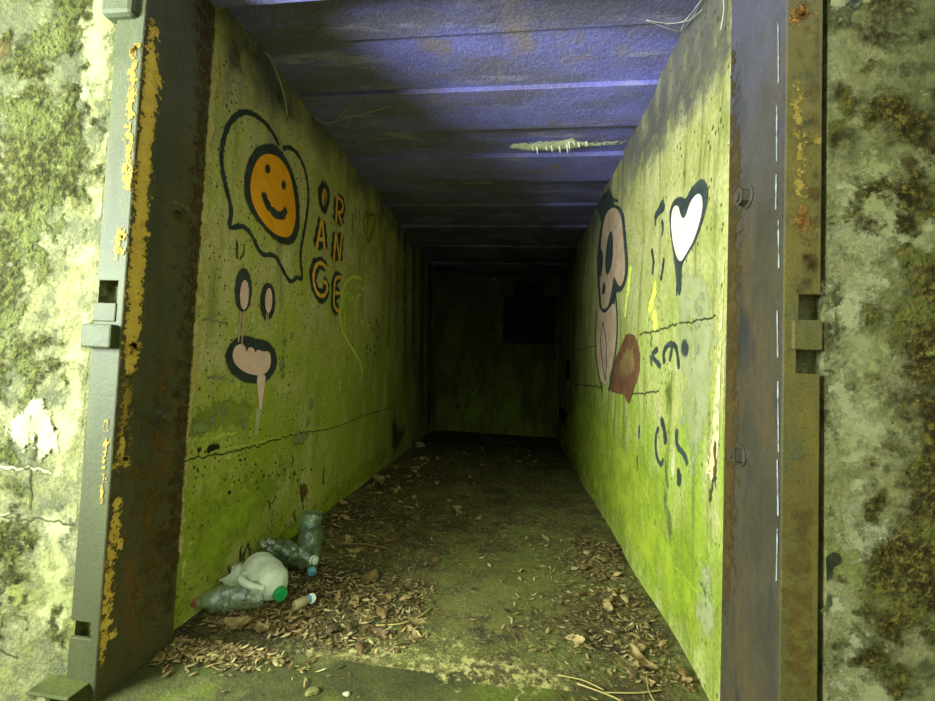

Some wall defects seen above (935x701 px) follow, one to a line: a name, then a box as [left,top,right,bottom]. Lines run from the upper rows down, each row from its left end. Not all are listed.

peeling [75,0,115,127]
peeling [84,132,109,229]
damp [510,132,626,155]
damp [640,18,730,168]
rust [789,81,822,235]
peeling [48,240,97,324]
peeling [98,17,165,666]
rust [129,0,215,627]
crack [0,464,74,526]
peeling [5,334,89,647]